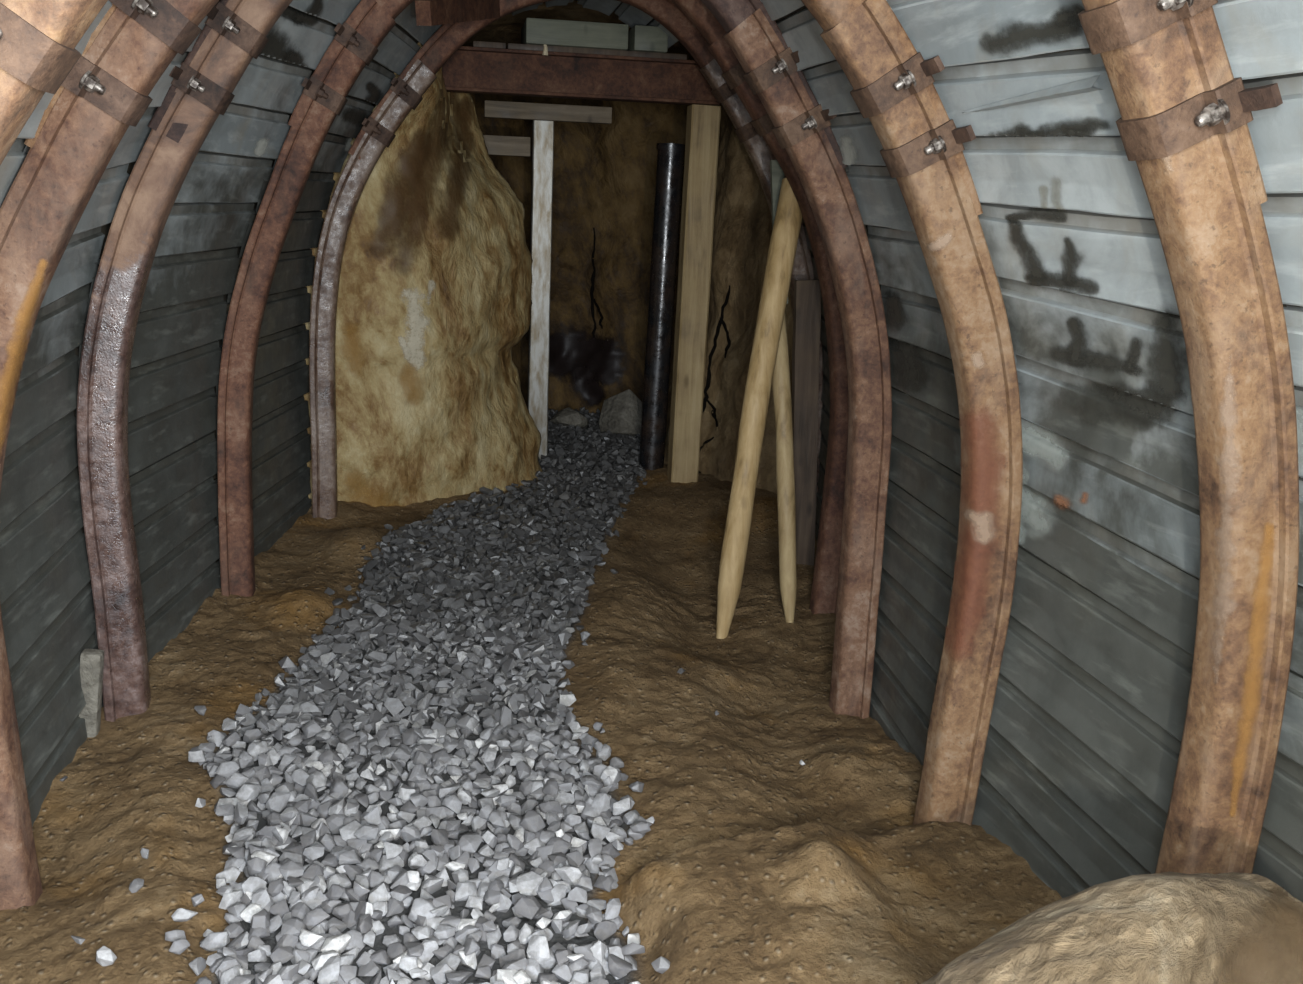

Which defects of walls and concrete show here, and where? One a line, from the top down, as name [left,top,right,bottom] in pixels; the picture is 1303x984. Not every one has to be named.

leakage [981,4,1084,53]
leakage [1006,188,1099,295]
rust [0,260,46,447]
leakage [1051,311,1188,430]
rust [1231,525,1273,816]